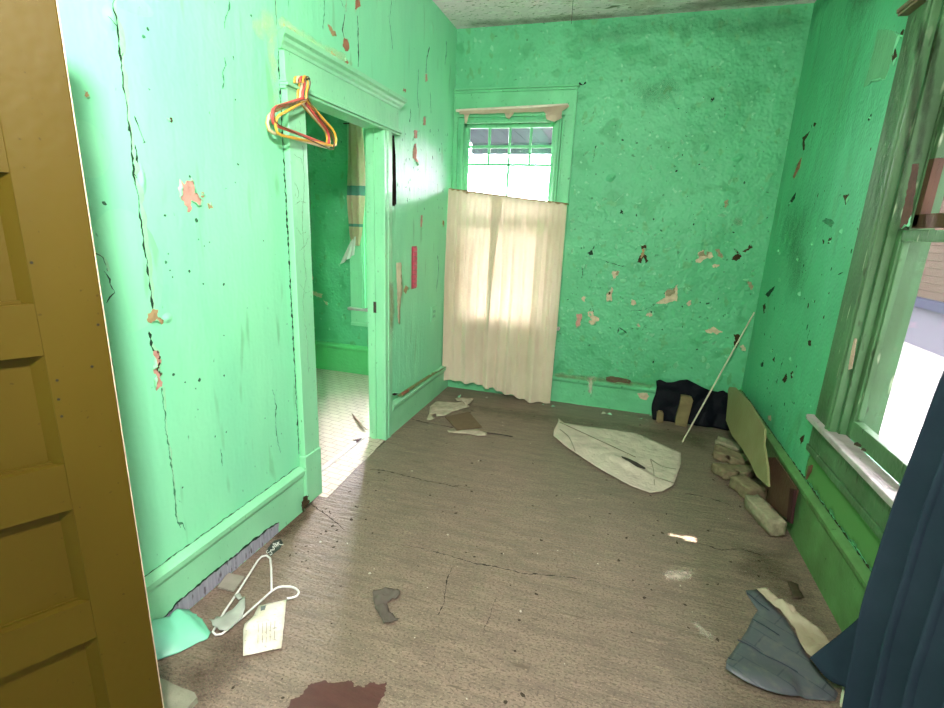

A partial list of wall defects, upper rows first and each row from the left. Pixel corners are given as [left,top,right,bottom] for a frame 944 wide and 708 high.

crack [108,0,158,351]
peeling [178,175,213,222]
crack [95,251,115,303]
peeling [563,239,724,335]
spalling [147,309,164,325]
peeling [606,366,637,383]
crack [395,544,613,614]